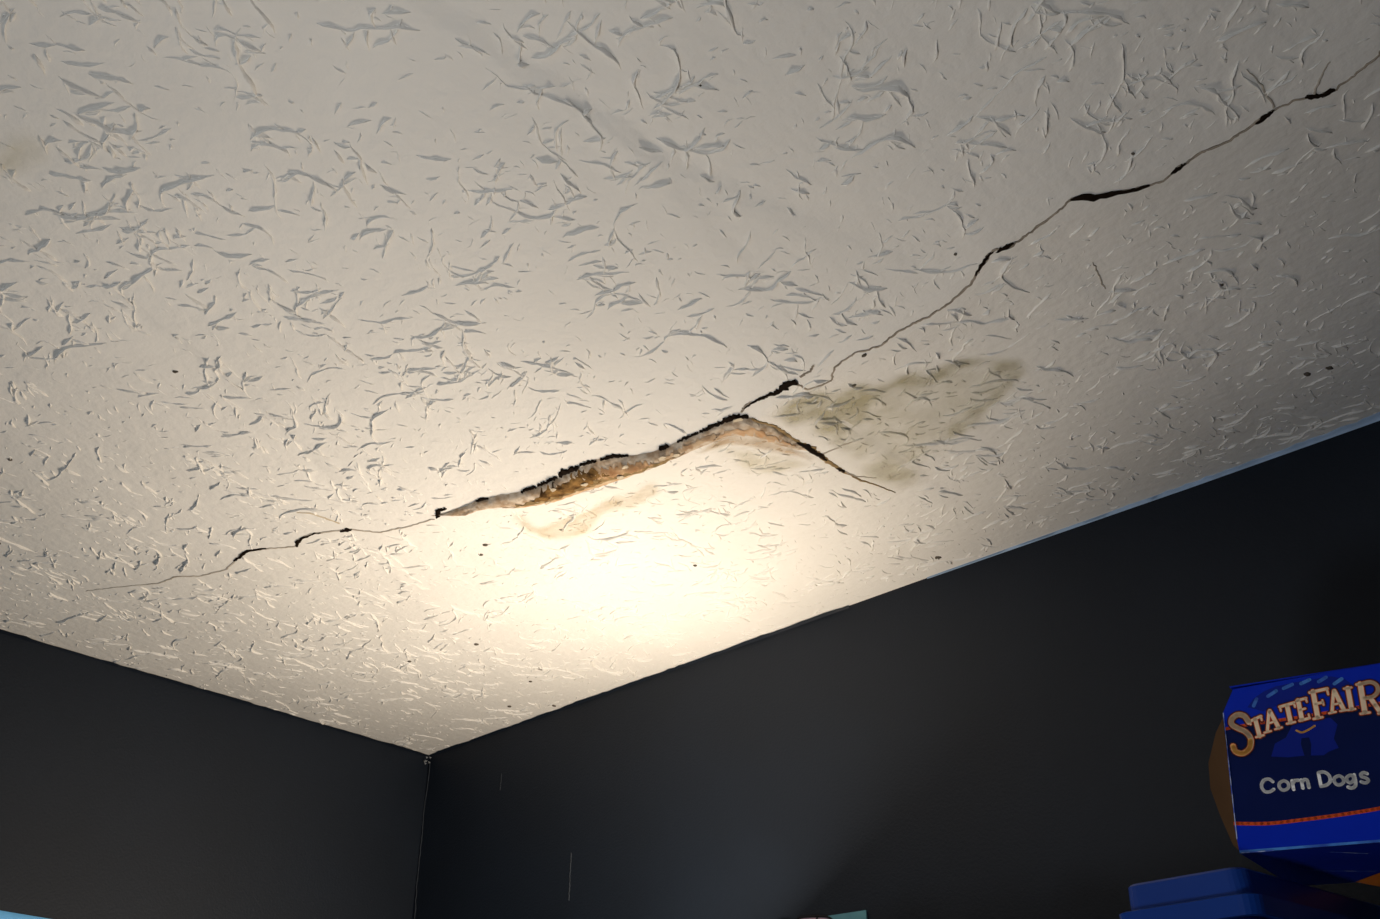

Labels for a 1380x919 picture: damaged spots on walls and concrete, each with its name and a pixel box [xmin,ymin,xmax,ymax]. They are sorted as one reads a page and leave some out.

peeling [432,414,807,519]
crack [740,51,1380,493]